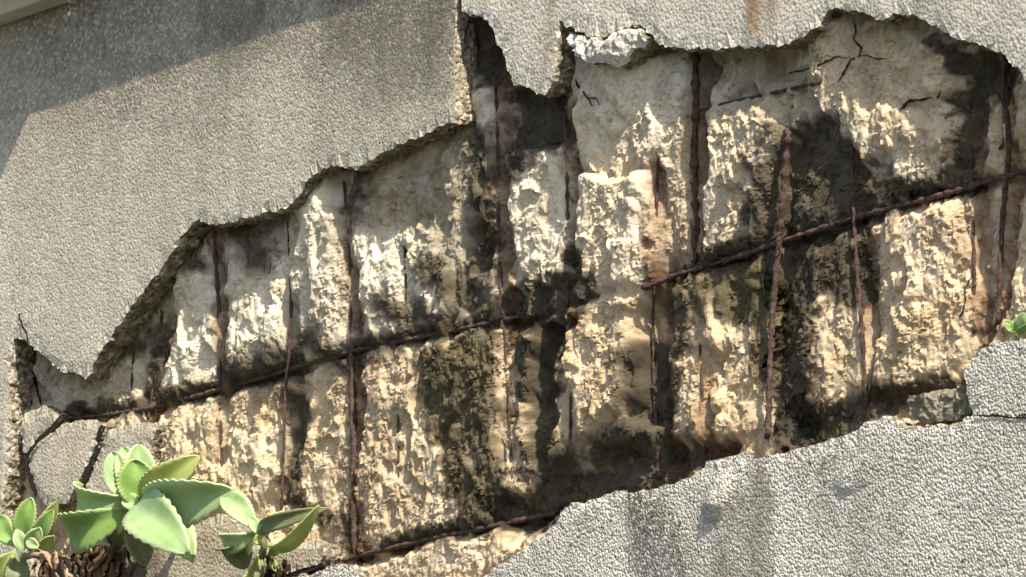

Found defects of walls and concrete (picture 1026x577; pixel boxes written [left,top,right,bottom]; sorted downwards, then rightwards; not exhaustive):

corrosion [213,239,232,403]
spalling [29,12,990,477]
corrosion [641,227,667,293]
spalling [801,68,1026,428]
corrosion [975,279,1013,347]
spalling [19,338,469,577]
corrosion [353,367,368,566]
spalling [358,518,552,577]
spalling [476,325,547,504]
crack [974,412,1026,420]